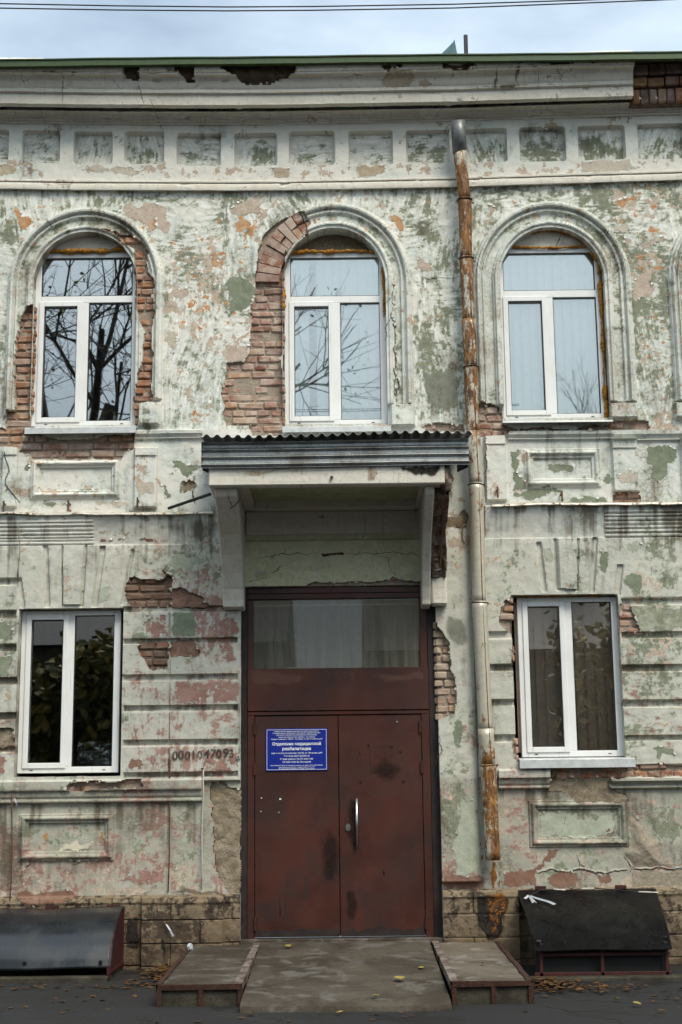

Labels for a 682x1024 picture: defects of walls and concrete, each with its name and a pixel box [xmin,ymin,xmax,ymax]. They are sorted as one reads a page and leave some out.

spalling [124,67,139,81]
spalling [174,67,195,83]
spalling [221,66,296,85]
spalling [628,61,682,109]
peeling [217,199,262,235]
spalling [0,229,155,471]
spalling [221,210,333,436]
spalling [124,576,208,671]
spalling [433,622,464,748]
spalling [202,747,242,894]
rust [480,843,507,932]
crack [537,856,682,874]